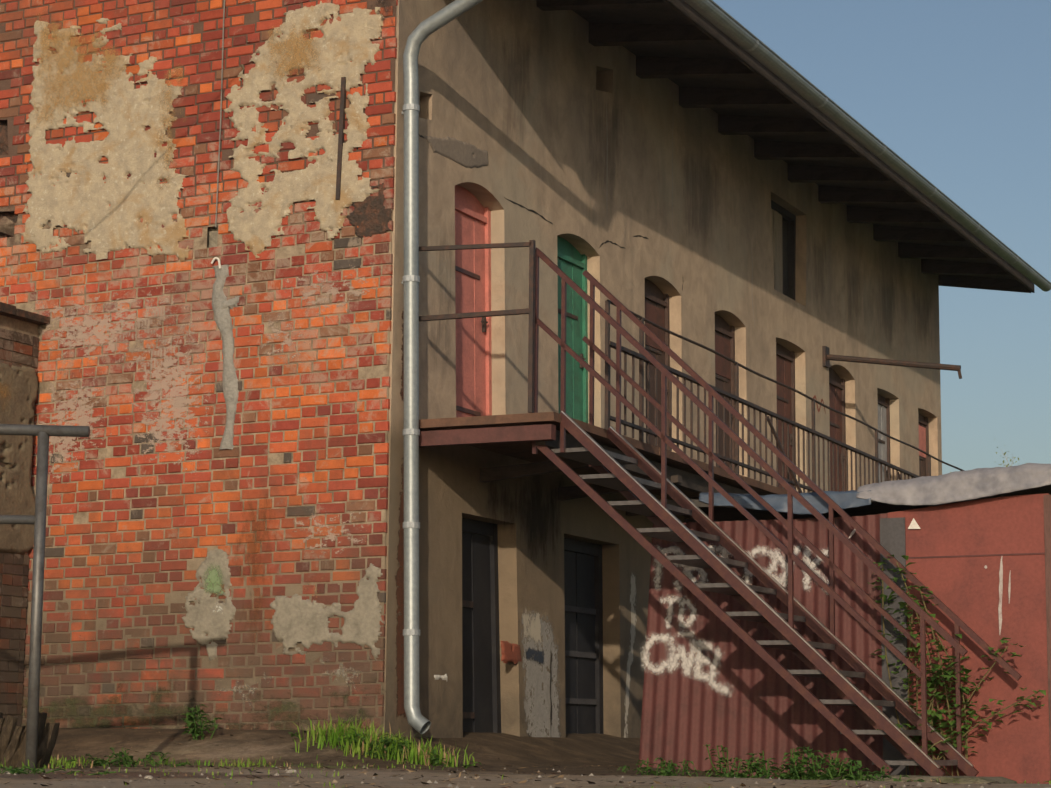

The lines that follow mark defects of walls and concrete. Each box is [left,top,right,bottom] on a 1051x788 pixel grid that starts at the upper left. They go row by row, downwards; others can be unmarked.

peeling [19,18,191,262]
peeling [224,1,392,258]
crack [504,197,553,224]
peeling [206,641,218,661]
peeling [501,607,561,738]